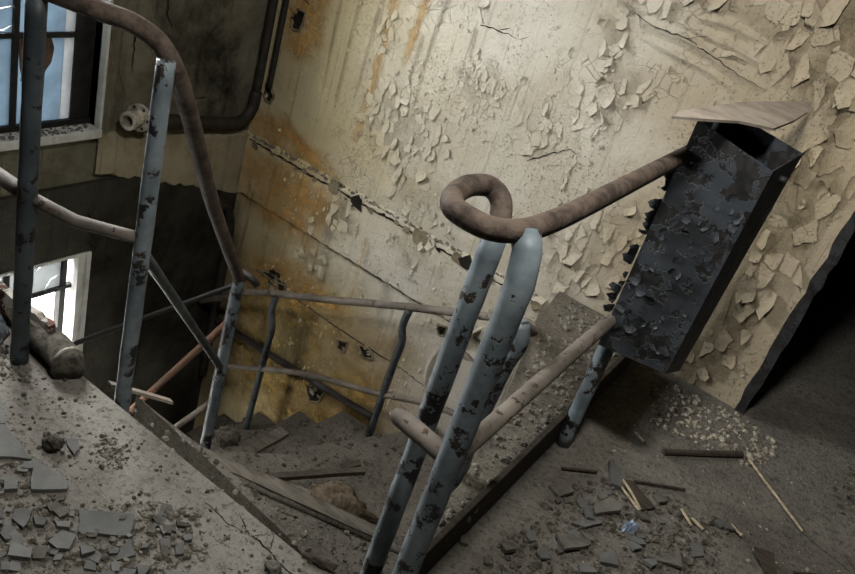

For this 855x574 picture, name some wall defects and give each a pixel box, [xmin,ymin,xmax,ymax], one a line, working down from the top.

rust [408,0,429,53]
spalling [263,83,275,104]
peeling [283,0,727,304]
peeling [681,0,855,385]
spalling [256,263,291,291]
spalling [415,316,448,344]
water stain [232,296,382,423]